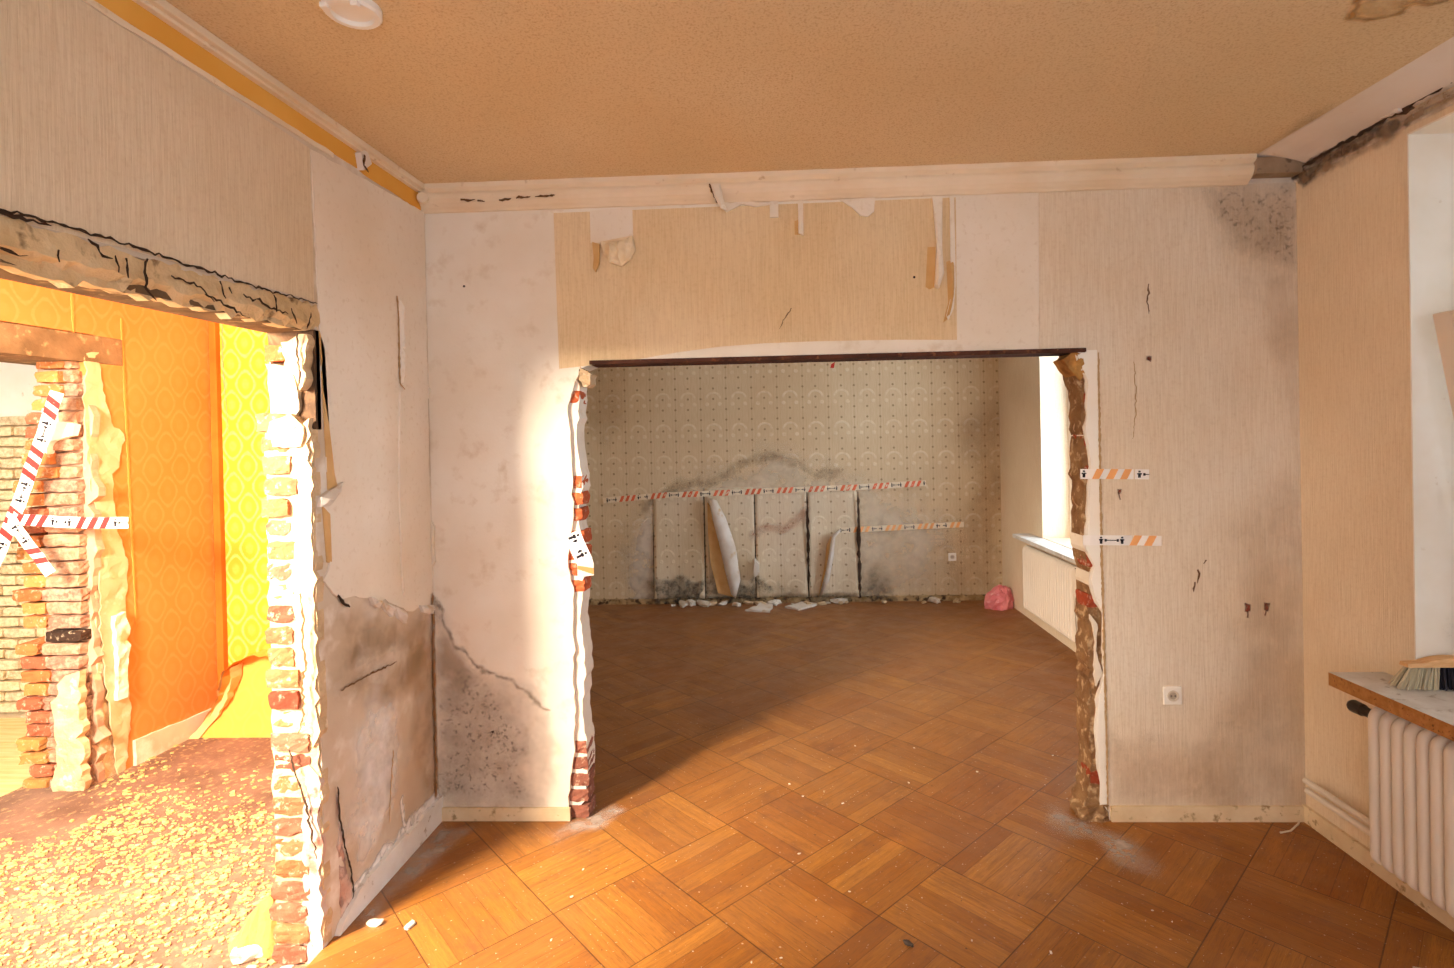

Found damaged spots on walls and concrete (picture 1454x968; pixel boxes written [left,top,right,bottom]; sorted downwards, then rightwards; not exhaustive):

water stain [1291,87,1452,185]
peeling [590,207,636,272]
peeling [317,482,344,507]
crack [298,593,308,734]
crack [341,662,395,691]
water stain [448,631,544,792]